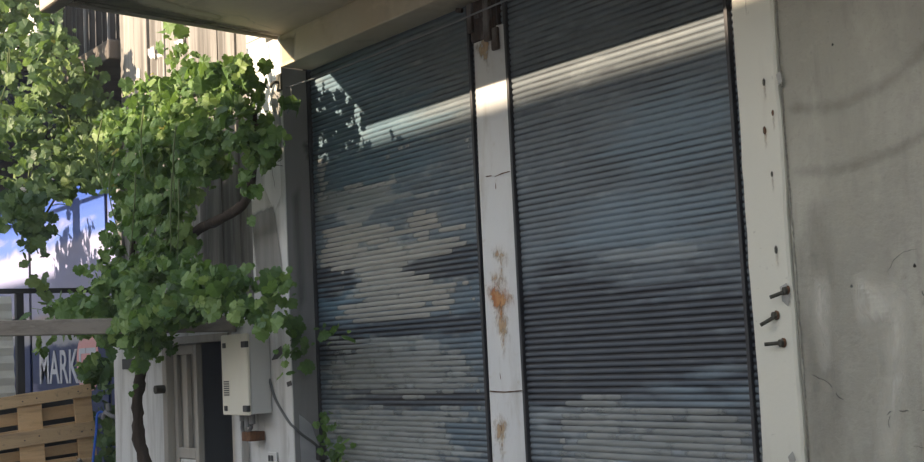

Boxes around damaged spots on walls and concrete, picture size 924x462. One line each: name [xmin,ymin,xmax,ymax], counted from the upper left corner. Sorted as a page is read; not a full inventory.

rust [490,251,512,342]
crack [776,0,844,457]